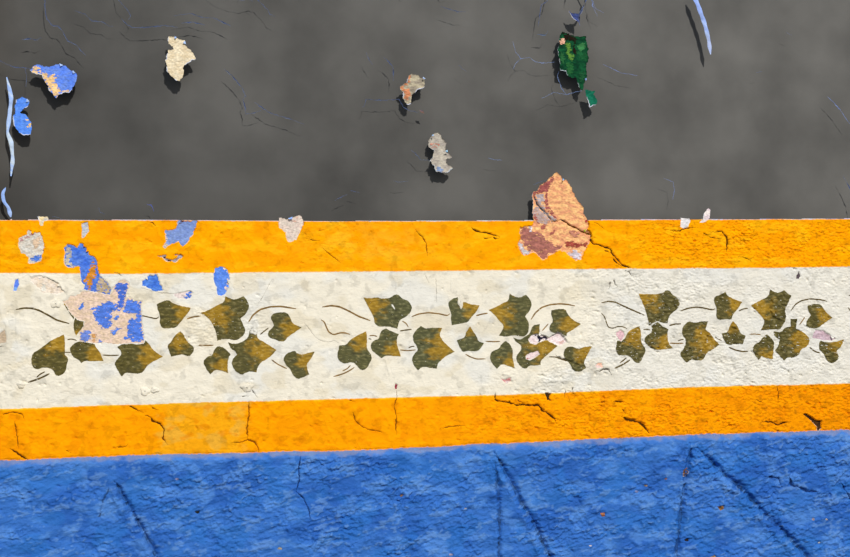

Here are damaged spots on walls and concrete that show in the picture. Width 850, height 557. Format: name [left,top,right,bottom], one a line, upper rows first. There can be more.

peeling [30,63,77,98]
peeling [165,36,196,81]
peeling [400,74,425,105]
flaking render [557,32,597,107]
peeling [13,97,32,135]
flaking render [428,133,453,173]
peeling [18,216,49,264]
peeling [160,220,197,263]
peeling [278,215,304,242]
peeling [518,172,593,261]
peeling [30,222,144,344]
peeling [213,267,230,296]